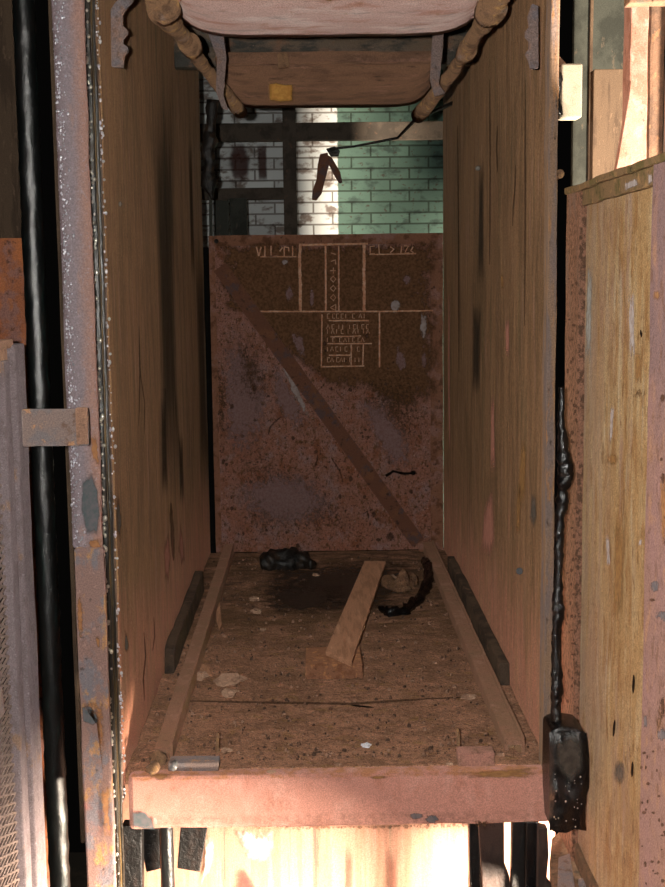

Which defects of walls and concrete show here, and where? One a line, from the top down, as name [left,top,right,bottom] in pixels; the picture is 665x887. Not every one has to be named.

corrosion [221,242,437,442]
corrosion [88,703,103,768]
corrosion [102,789,111,835]